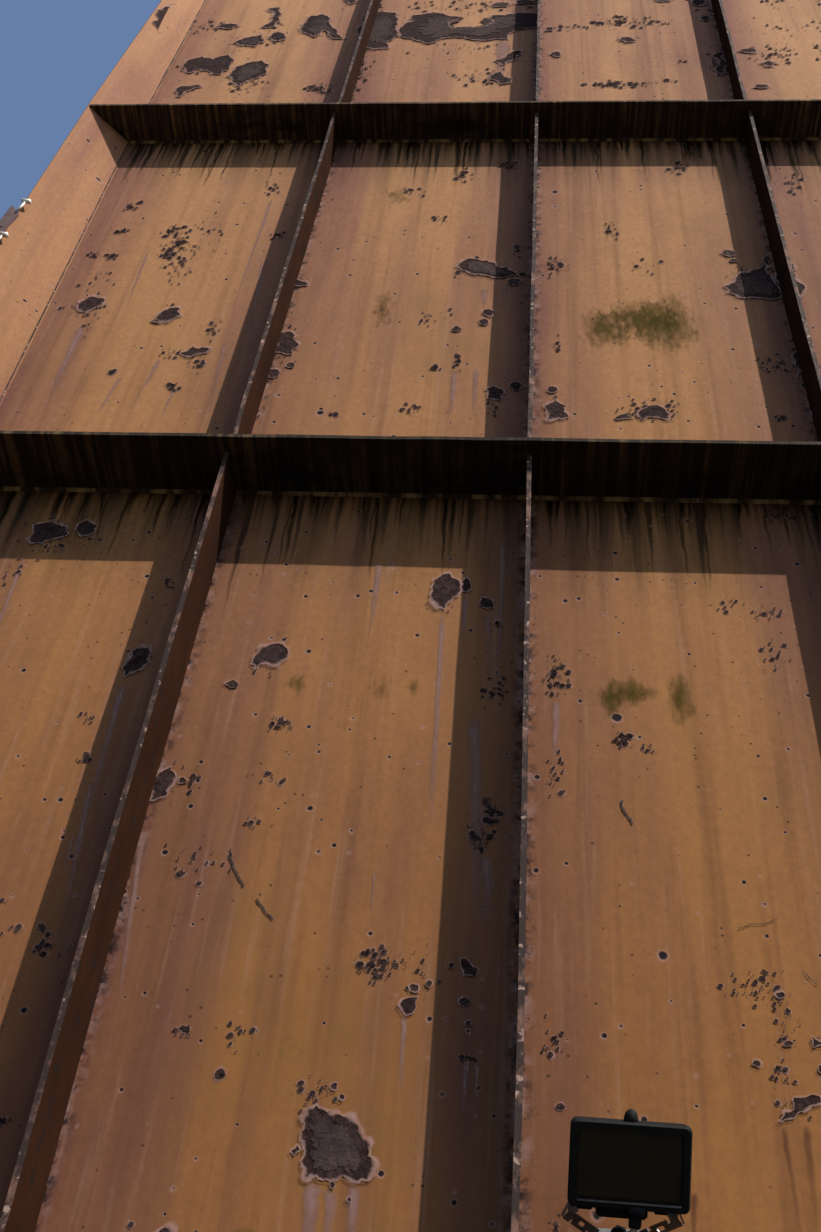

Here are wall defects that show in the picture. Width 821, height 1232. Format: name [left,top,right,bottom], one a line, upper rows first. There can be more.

peeling [153,3,287,98]
peeling [299,0,678,93]
peeling [721,249,782,300]
peeling [0,514,101,621]
peeling [251,641,289,677]
peeling [426,546,508,764]
spalling [1,923,76,957]
peeling [718,969,821,1122]
peeling [290,1074,379,1232]